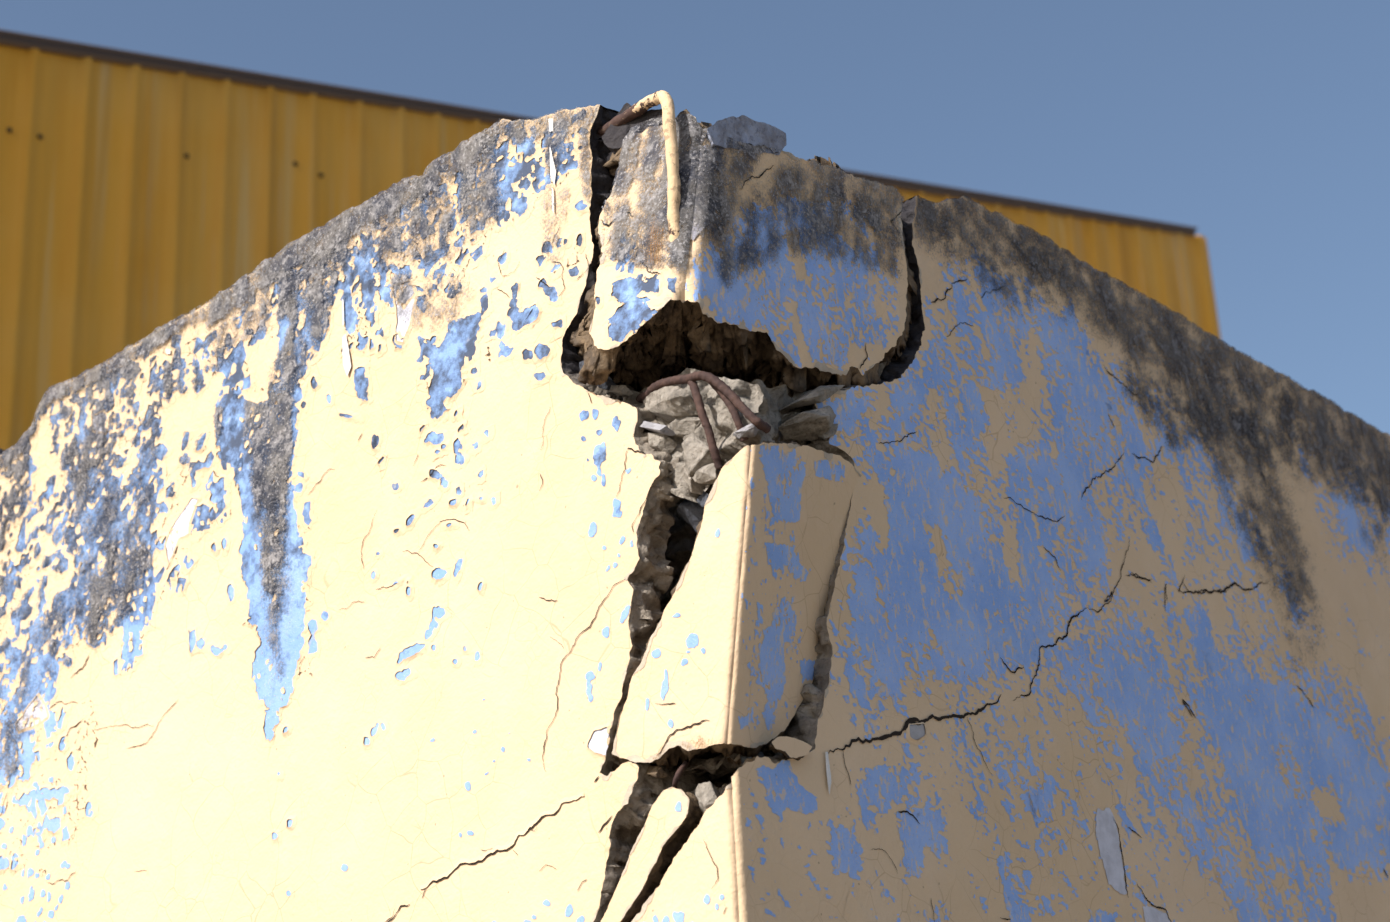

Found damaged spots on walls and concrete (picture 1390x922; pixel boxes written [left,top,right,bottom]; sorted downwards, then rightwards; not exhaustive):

peeling [20,881,70,922]
peeling [0,90,743,880]
crack [341,519,467,609]
damp [0,104,1390,779]
crack [386,105,1269,922]
peeling [565,189,1390,922]